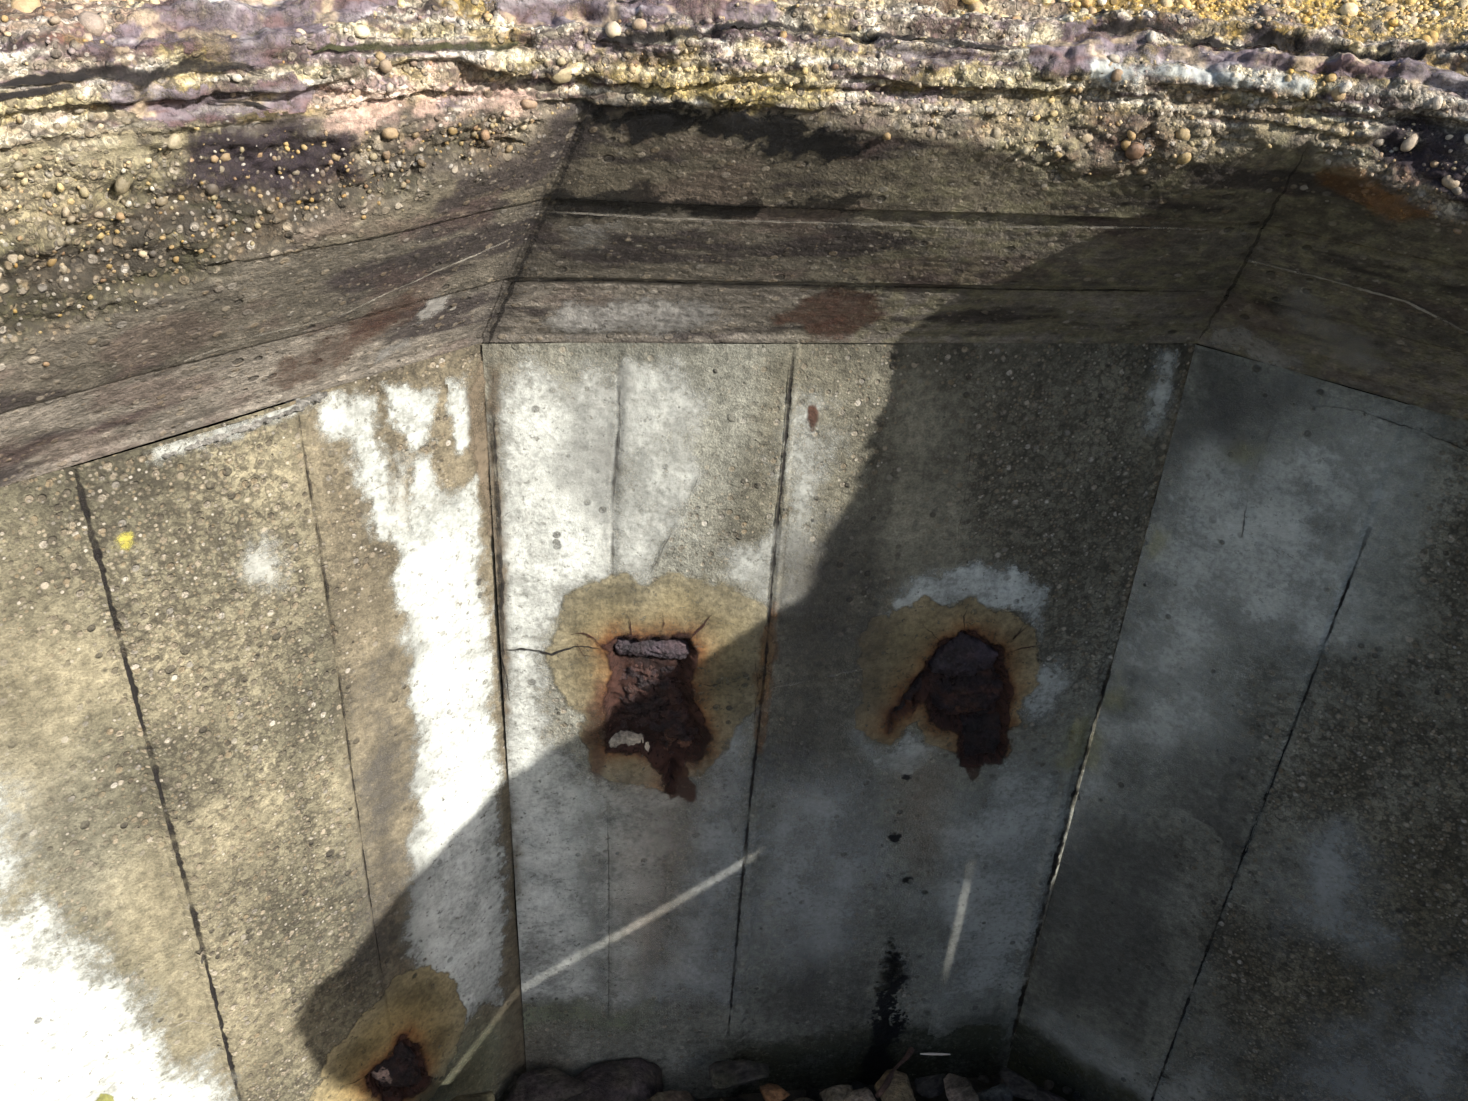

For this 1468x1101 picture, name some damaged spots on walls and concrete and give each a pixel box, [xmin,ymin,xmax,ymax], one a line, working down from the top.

water stain [578,96,880,165]
spalling [0,0,1468,346]
rust [776,288,884,339]
water stain [363,359,877,1024]
rust [545,572,777,802]
rust [854,595,1041,780]
water stain [851,391,1421,1085]
water stain [0,798,231,1101]
rust [310,965,467,1101]